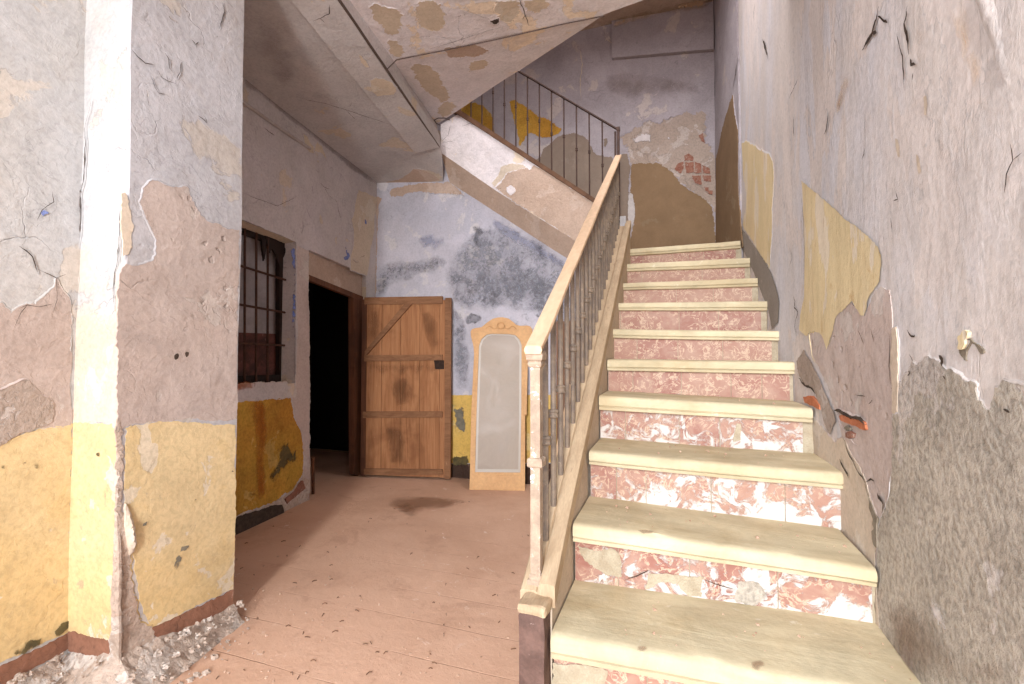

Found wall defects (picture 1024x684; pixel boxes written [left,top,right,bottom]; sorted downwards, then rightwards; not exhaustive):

peeling [368,0,447,58]
peeling [410,63,451,103]
peeling [443,44,490,72]
peeling [489,0,551,26]
crack [862,7,915,80]
crack [79,101,93,244]
flaking render [491,110,716,241]
crack [16,245,79,323]
water stain [451,227,563,373]
flaking render [0,179,311,664]
flaking render [797,287,990,570]